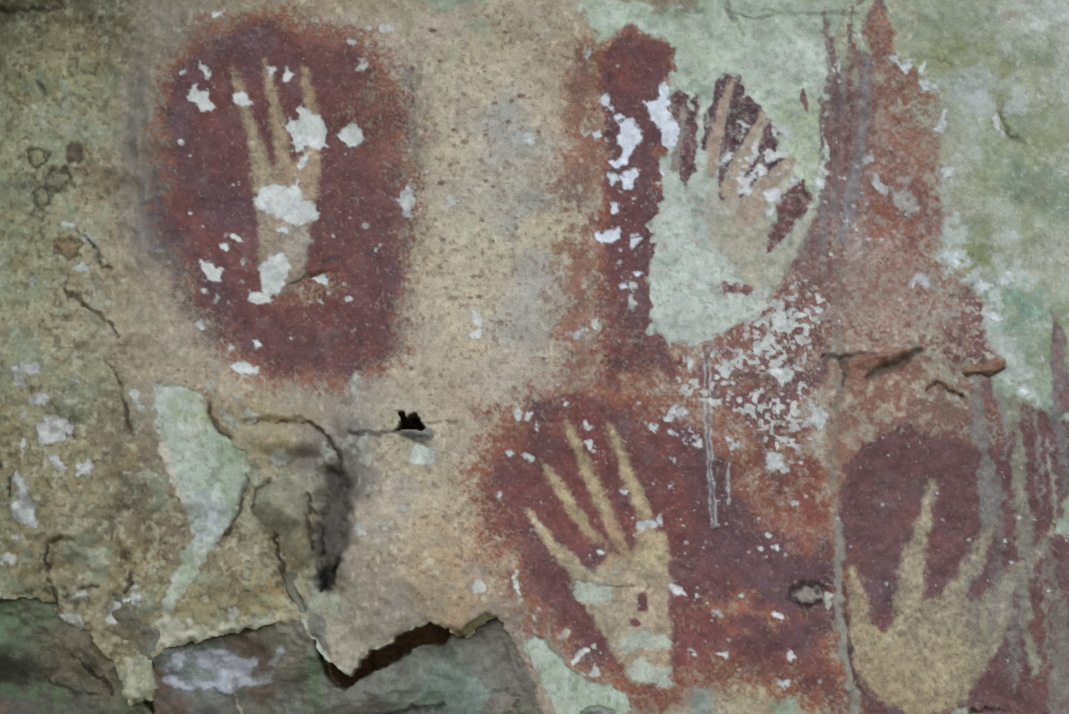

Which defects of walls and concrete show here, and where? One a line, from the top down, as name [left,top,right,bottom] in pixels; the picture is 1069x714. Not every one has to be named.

peeling [179,61,218,113]
peeling [231,91,252,108]
peeling [266,65,295,83]
peeling [252,103,365,237]
peeling [392,184,423,220]
peeling [219,232,243,252]
peeling [574,0,858,500]
peeling [199,259,229,305]
peeling [240,251,353,305]
peeling [821,152,1046,408]
peeling [227,343,259,376]
water stain [533,0,1069,714]